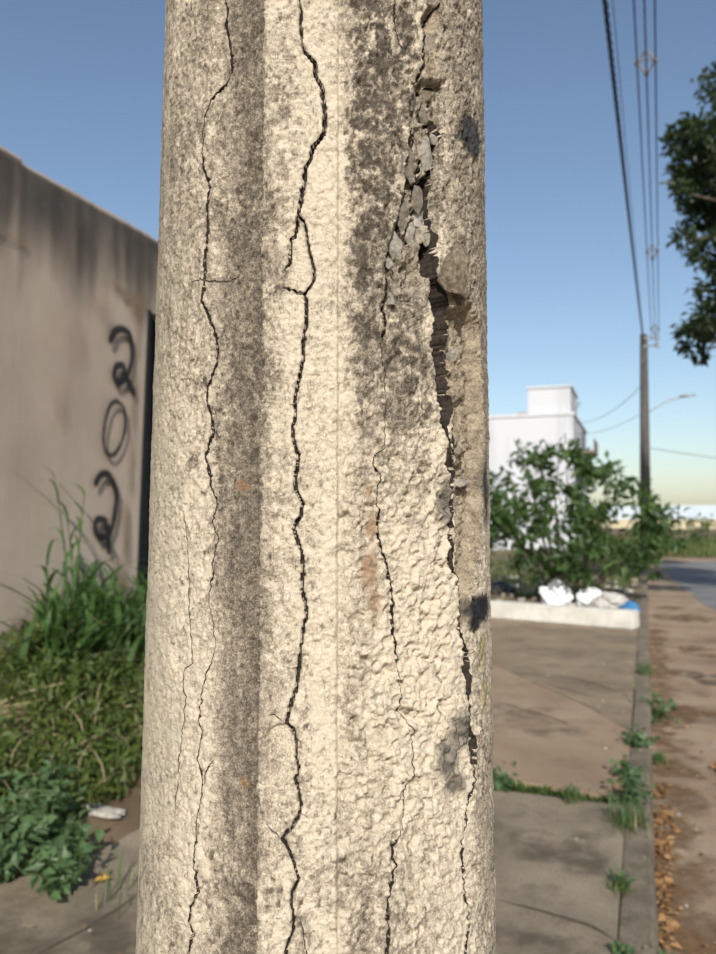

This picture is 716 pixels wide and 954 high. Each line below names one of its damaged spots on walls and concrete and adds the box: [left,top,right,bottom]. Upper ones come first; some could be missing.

crack [175,0,240,954]
crack [266,0,327,954]
crack [372,256,415,954]
spalling [384,4,446,306]
crack [393,0,478,954]
crack [496,899,612,938]